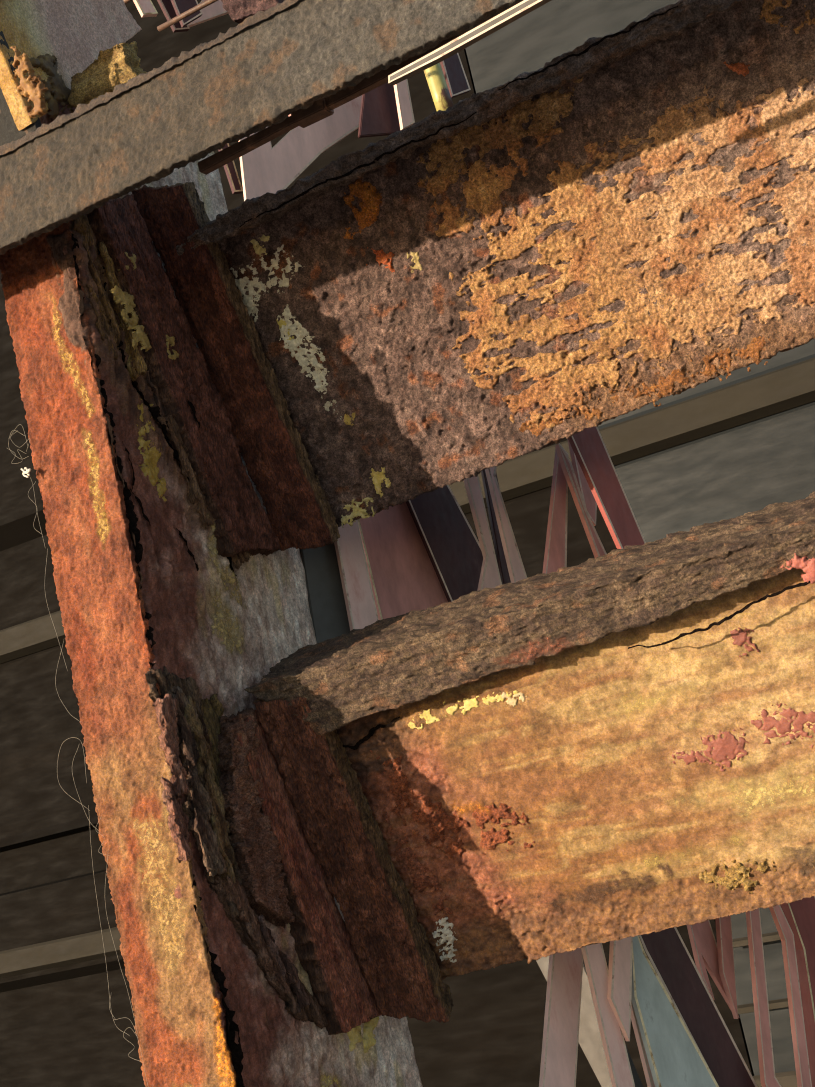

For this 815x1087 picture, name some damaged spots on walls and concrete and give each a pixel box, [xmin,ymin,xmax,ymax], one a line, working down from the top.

rust [343,177,382,239]
rust [416,77,815,437]
rust [53,301,93,418]
rust [69,215,216,542]
crack [71,234,200,692]
crack [628,581,811,649]
crack [343,716,400,750]
rust [134,666,328,1029]
rust [370,750,535,921]
rust [537,865,673,914]
rust [699,858,776,894]
rust [213,999,233,1087]